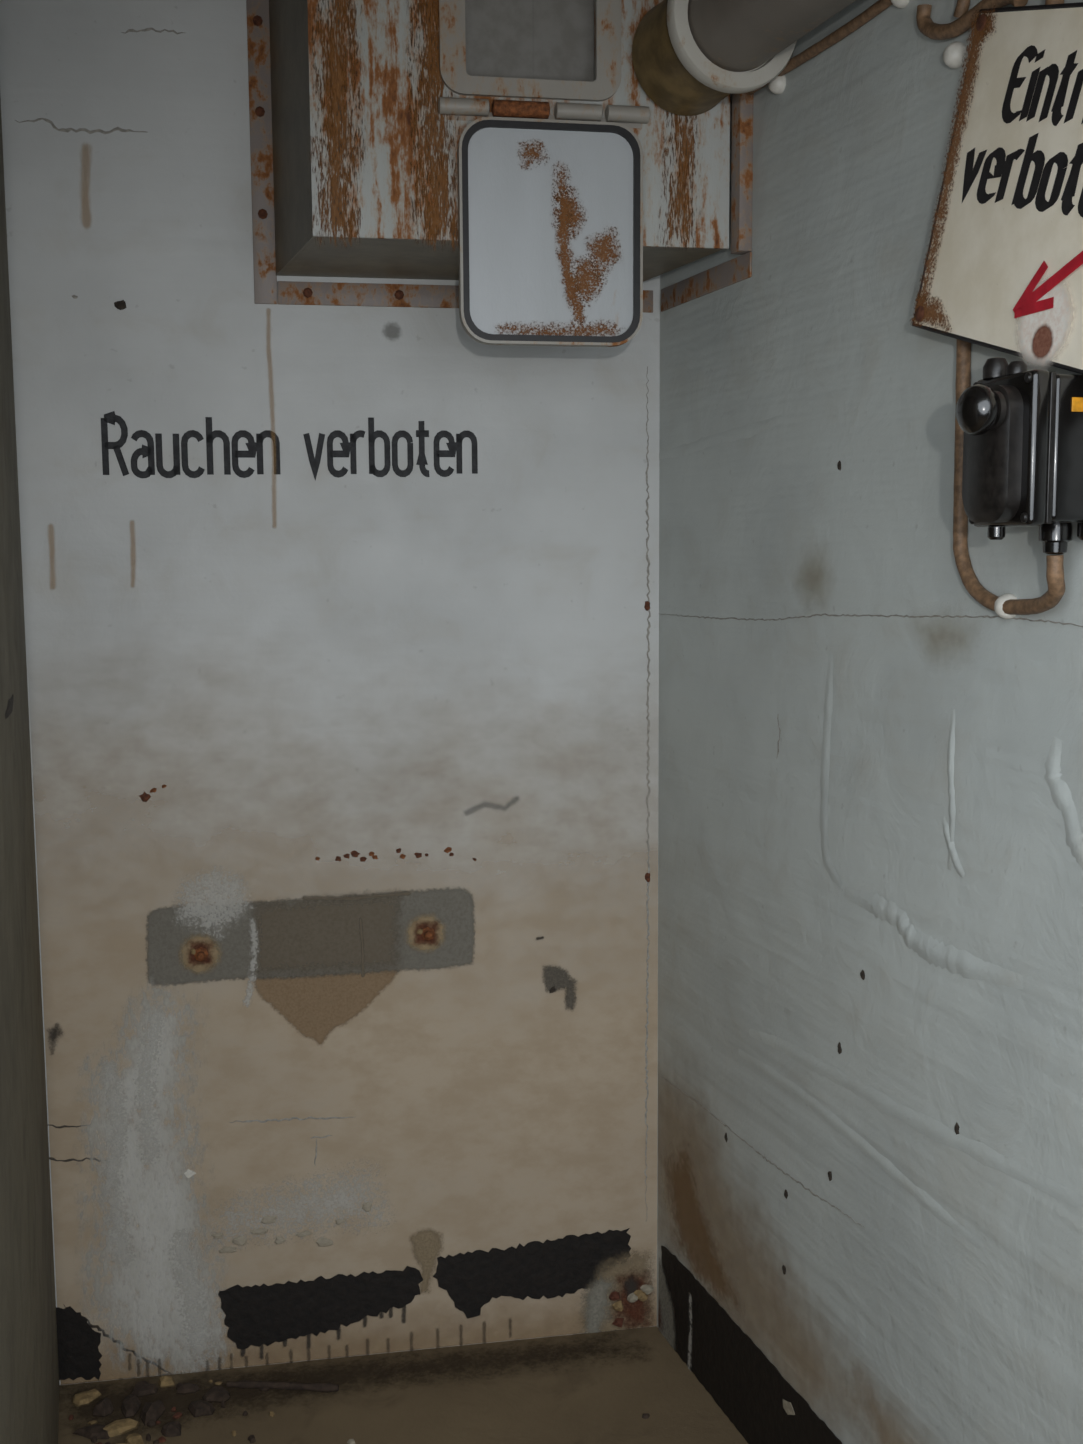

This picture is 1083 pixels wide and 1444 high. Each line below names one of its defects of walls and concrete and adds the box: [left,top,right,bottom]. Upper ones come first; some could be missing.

damp [35,800,816,1385]
peeling [56,1306,102,1380]
peeling [218,1228,675,1359]